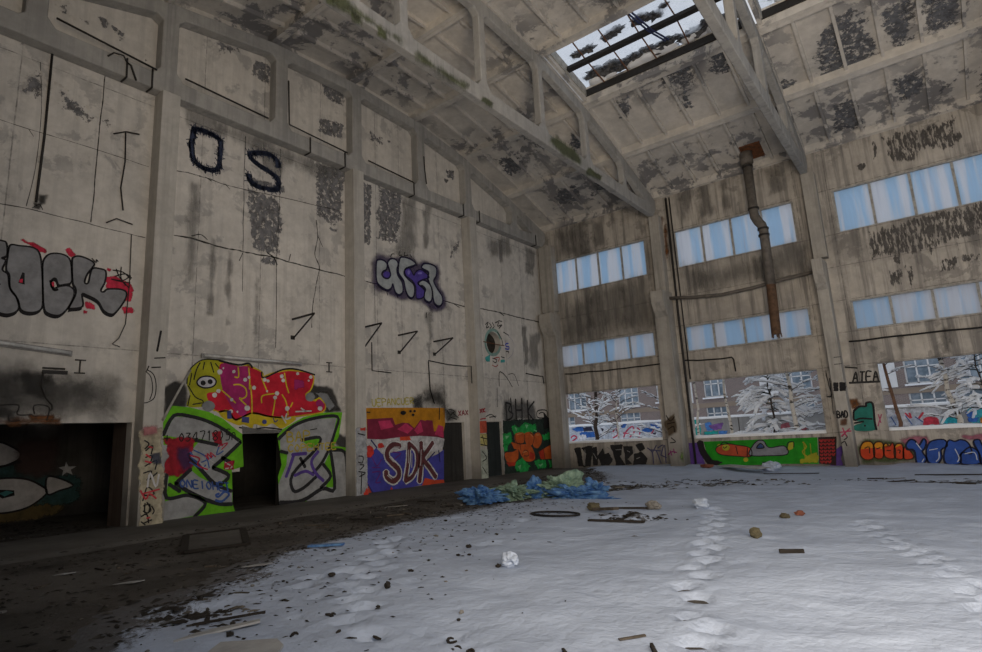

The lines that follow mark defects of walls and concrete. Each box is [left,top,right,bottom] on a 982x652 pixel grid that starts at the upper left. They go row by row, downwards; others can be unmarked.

peeling [812,8,878,75]
peeling [881,0,961,47]
peeling [893,72,923,100]
peeling [833,99,865,133]
peeling [858,114,962,170]
peeling [245,177,285,265]
peeling [314,161,345,231]
peeling [868,201,982,287]
leakage [22,372,85,397]